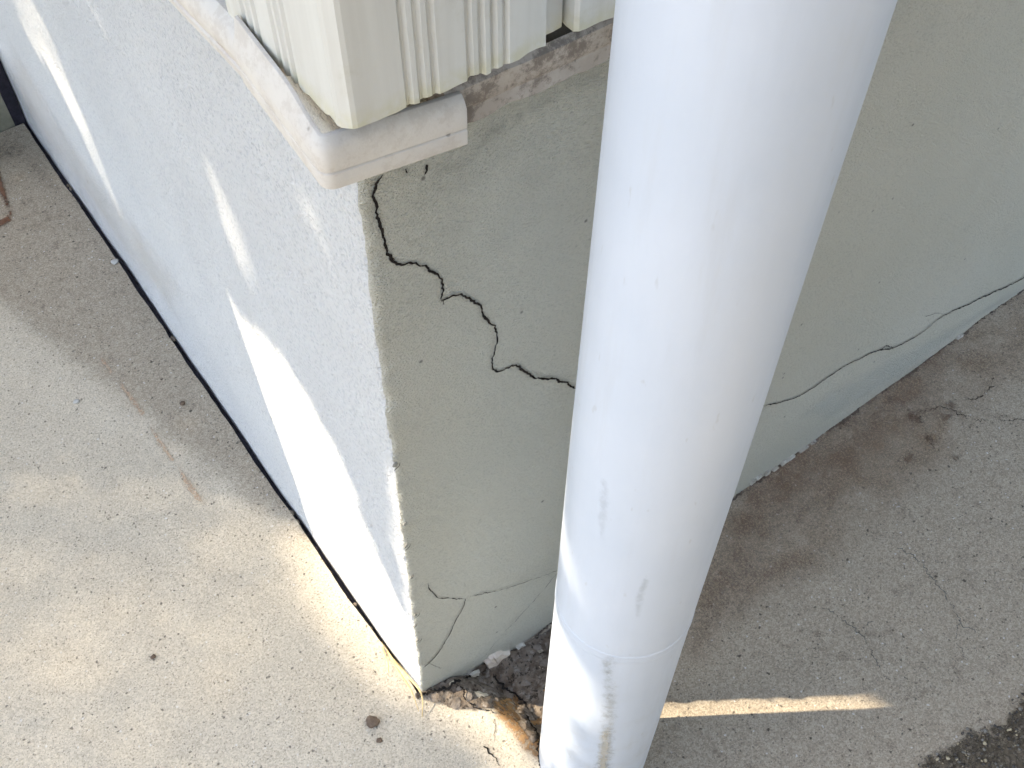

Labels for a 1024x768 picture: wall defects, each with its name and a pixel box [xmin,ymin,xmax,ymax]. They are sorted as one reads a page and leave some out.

crack [371,165,575,389]
crack [732,278,1024,501]
spalling [415,628,552,744]
crack [422,571,556,768]